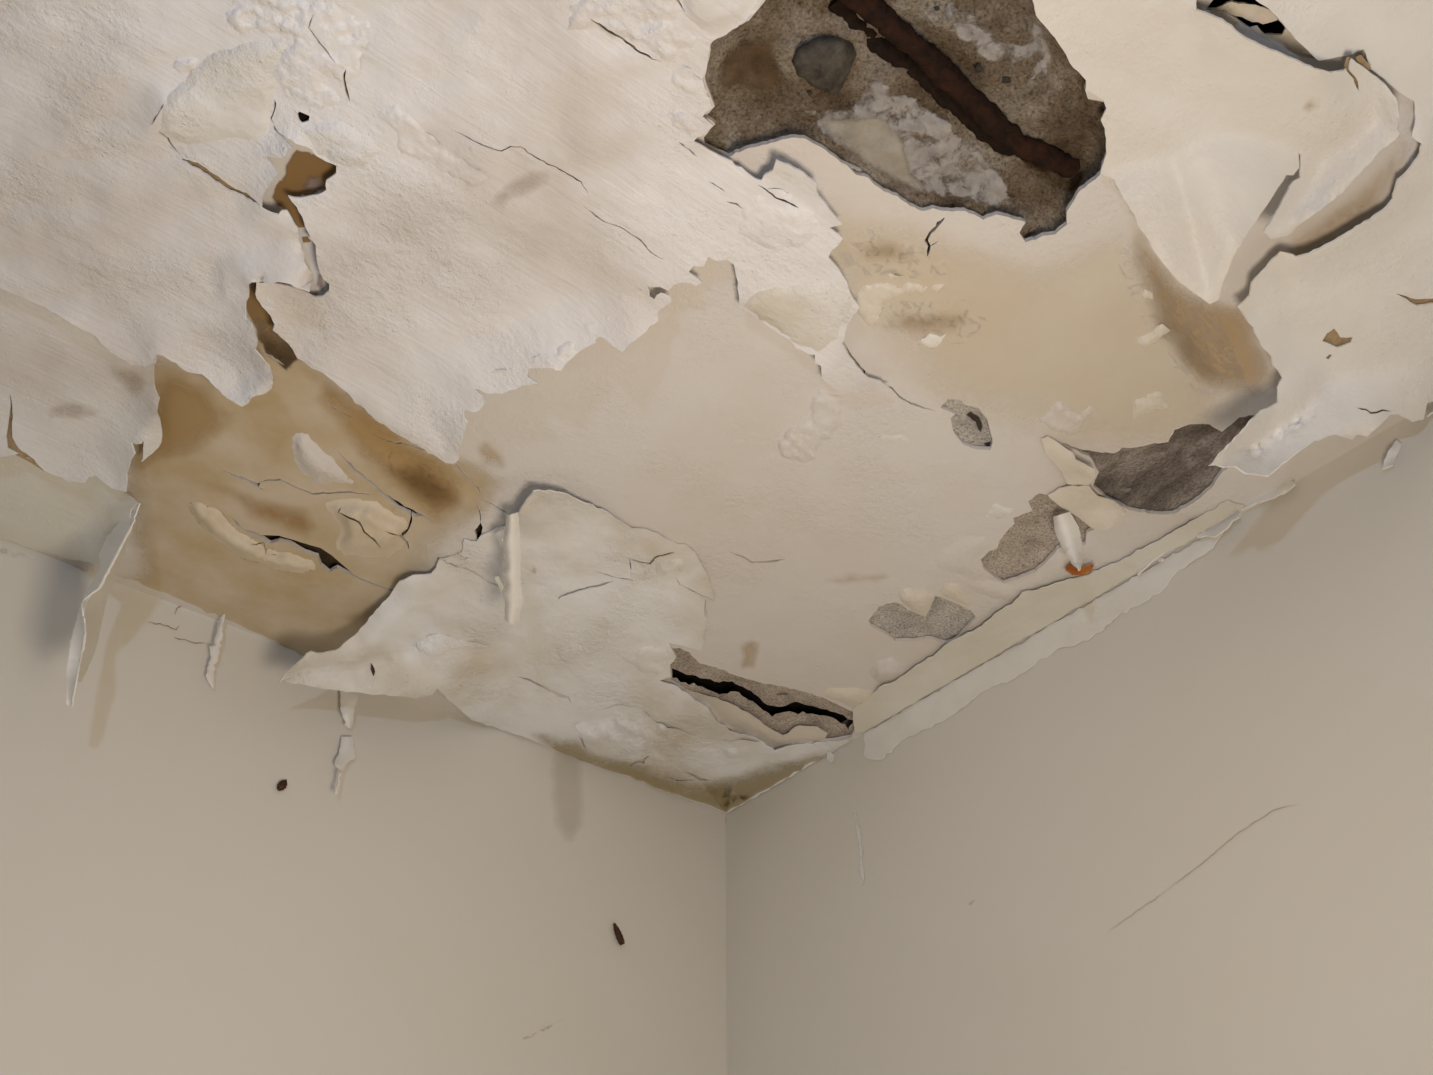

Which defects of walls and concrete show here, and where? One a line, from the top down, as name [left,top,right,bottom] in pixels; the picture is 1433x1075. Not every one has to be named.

crack [1208,0,1371,89]
peeling [0,0,1433,813]
damp [132,282,491,656]
crack [253,531,348,570]
crack [673,669,847,723]